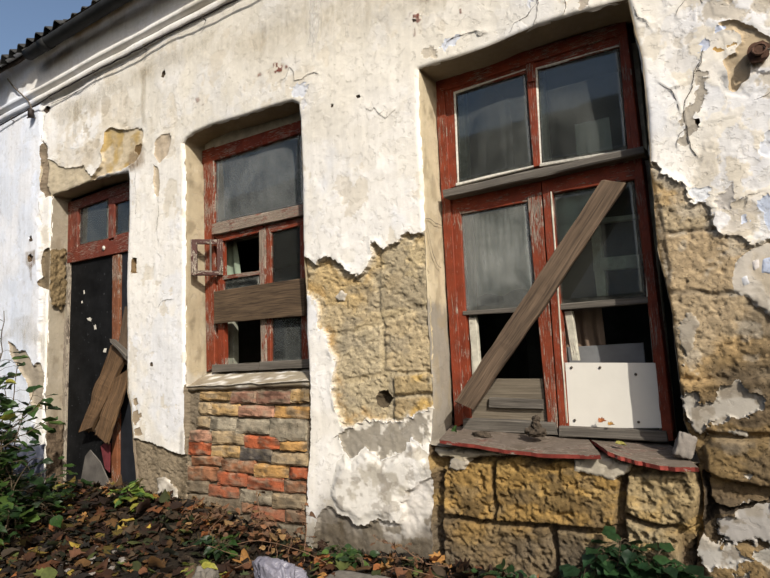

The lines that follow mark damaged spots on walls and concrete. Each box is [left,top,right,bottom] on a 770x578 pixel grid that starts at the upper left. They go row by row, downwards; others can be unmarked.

flaking render [698,19,770,92]
crack [660,50,703,155]
flaking render [39,127,143,198]
flaking render [153,134,171,197]
flaking render [37,248,68,310]
flaking render [8,341,45,409]
flaking render [306,230,509,470]
flaking render [650,161,770,578]
flaking render [311,477,434,562]